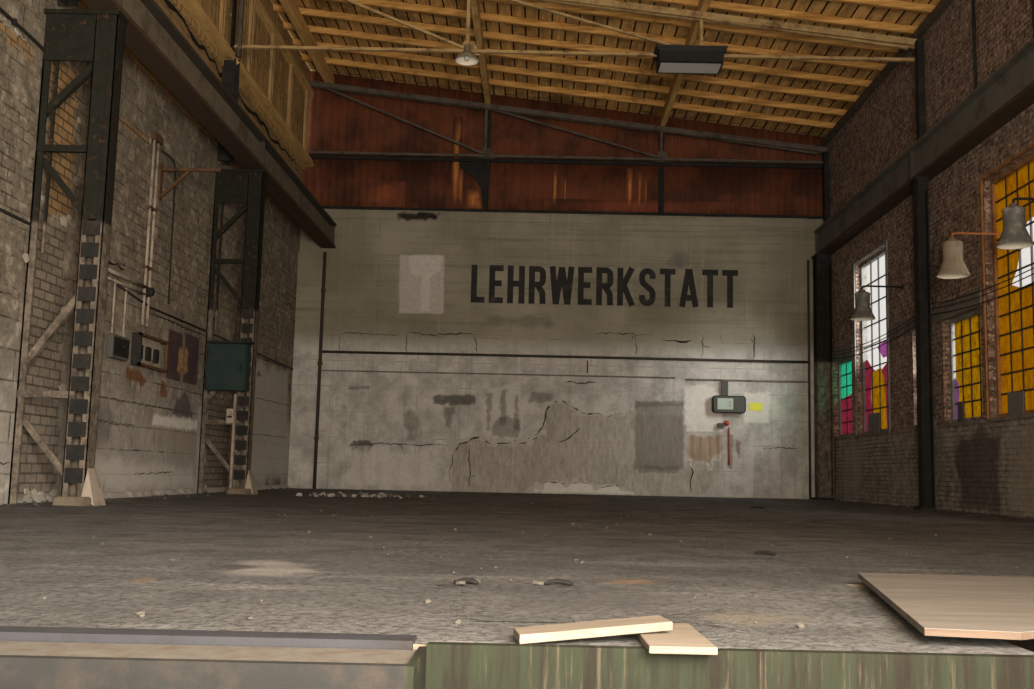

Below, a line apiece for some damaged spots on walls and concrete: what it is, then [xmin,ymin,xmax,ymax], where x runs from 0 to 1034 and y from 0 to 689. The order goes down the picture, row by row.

flaking render [442,398,728,497]
water stain [951,413,1007,515]